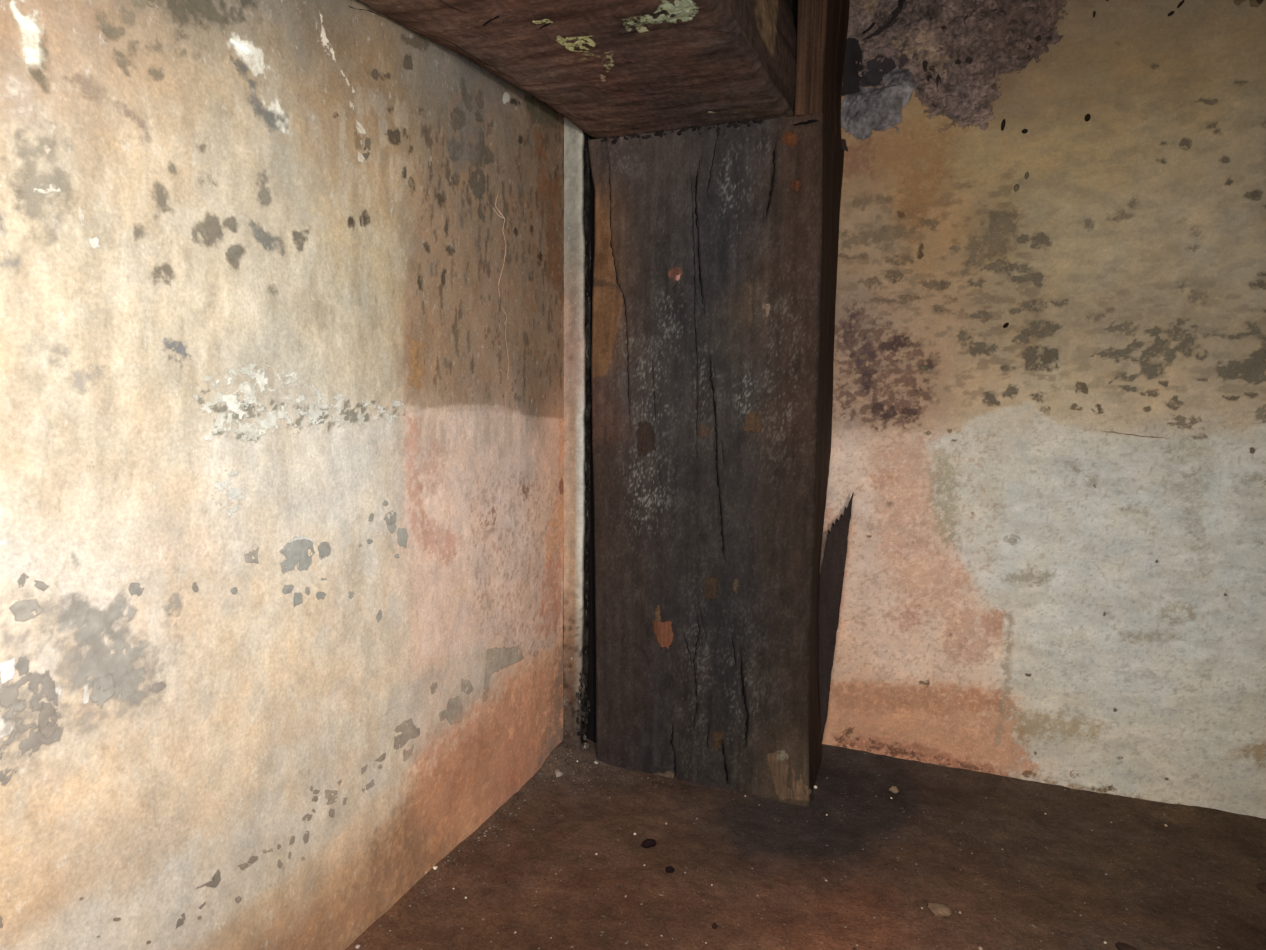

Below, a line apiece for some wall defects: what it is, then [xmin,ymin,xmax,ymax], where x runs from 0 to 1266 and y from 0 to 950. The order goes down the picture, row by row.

water stain [4,1,47,116]
flaking render [841,0,1067,133]
water stain [100,0,321,268]
water stain [153,264,173,283]
peeling [191,361,408,443]
water stain [348,211,370,226]
crack [575,84,759,557]
water stain [835,196,951,430]
water stain [1001,300,1066,372]
water stain [1087,315,1266,448]
peeling [245,547,259,563]
peeling [0,573,166,785]